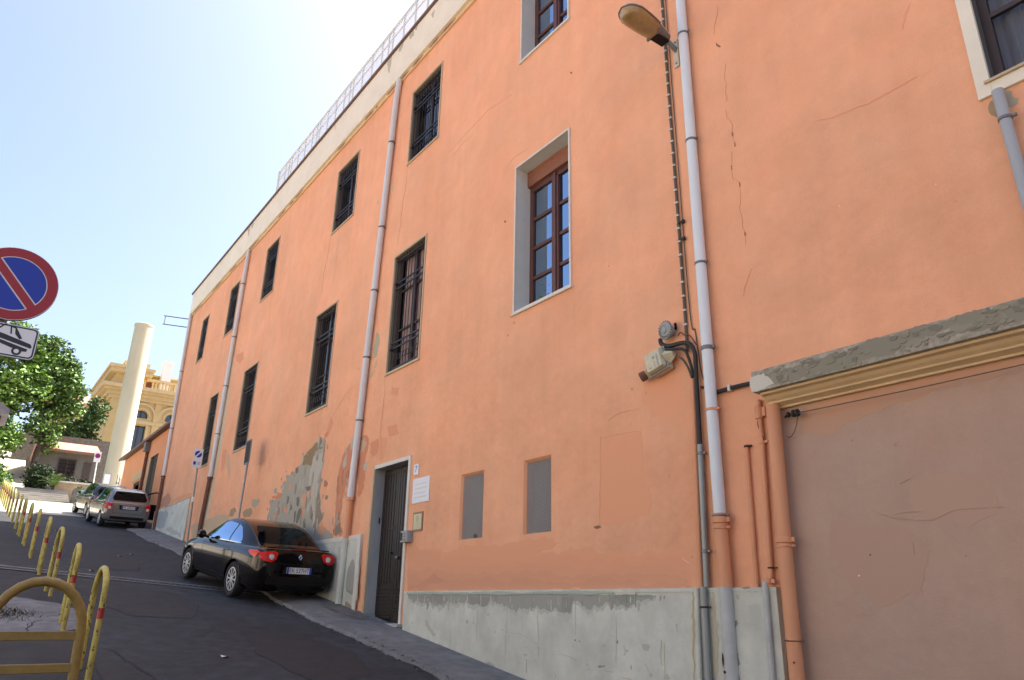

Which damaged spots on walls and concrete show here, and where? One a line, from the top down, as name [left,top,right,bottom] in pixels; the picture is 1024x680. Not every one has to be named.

flaking render [191,359,379,541]
damp [408,594,665,651]